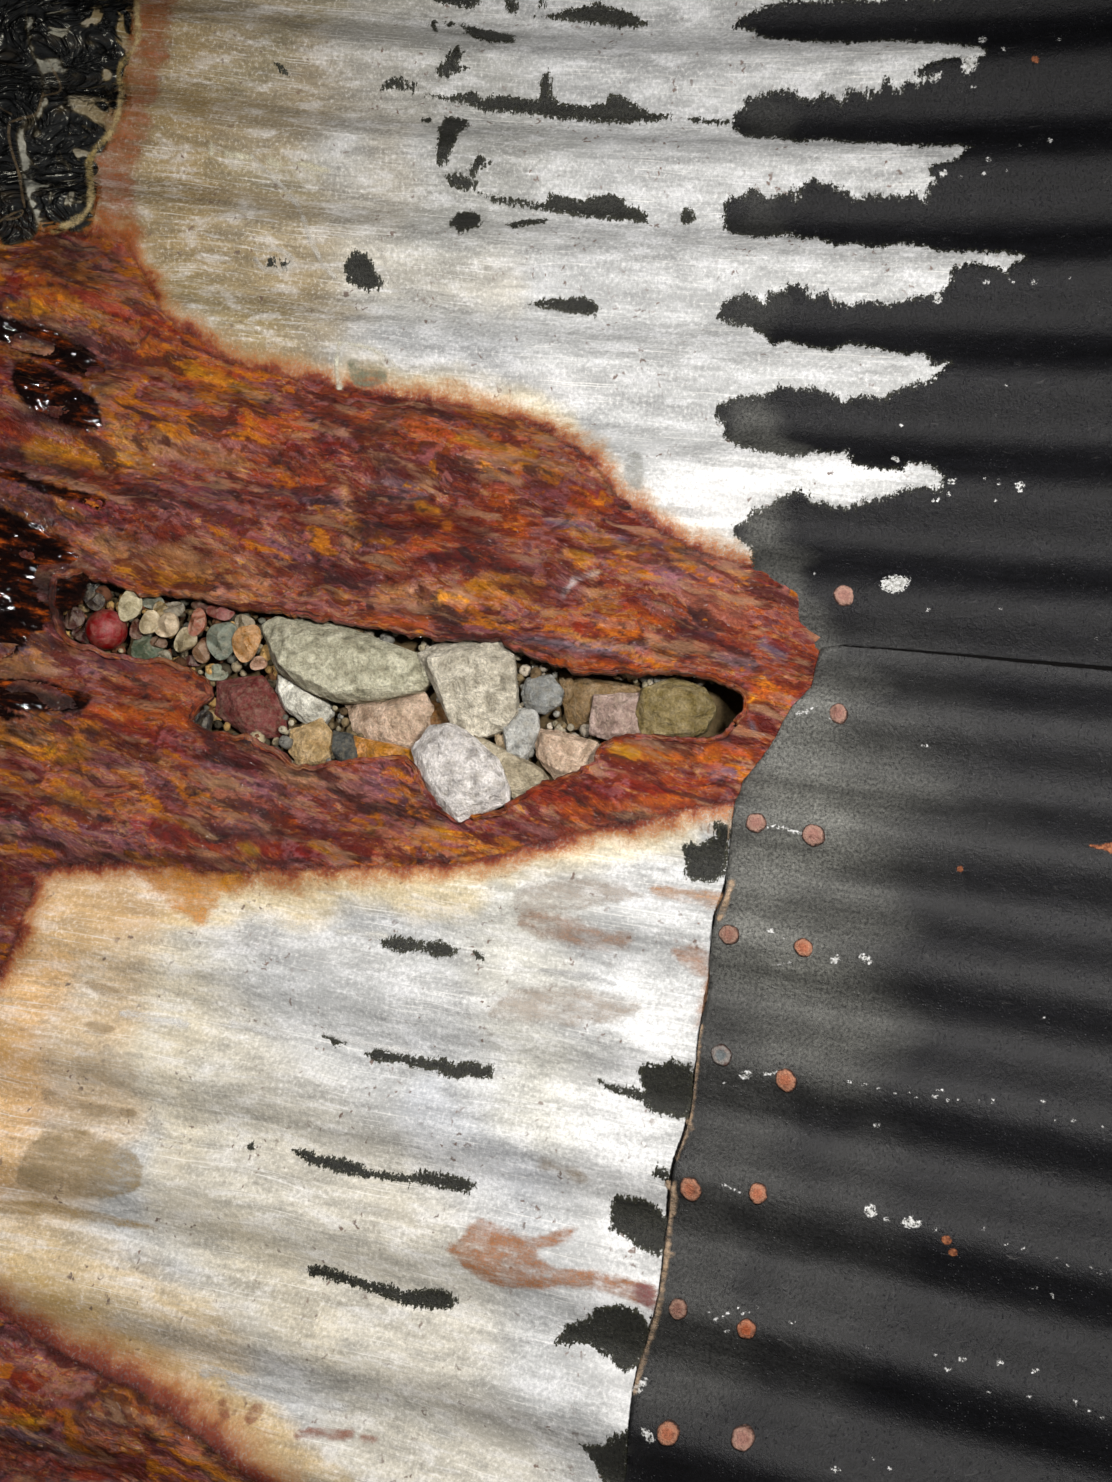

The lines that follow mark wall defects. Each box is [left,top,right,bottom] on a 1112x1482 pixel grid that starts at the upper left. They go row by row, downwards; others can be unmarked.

water stain [0,316,105,430]
peeling [421,0,1112,666]
corrosion [0,4,821,989]
corrosion [678,1025,703,1154]
corrosion [0,1286,298,1482]